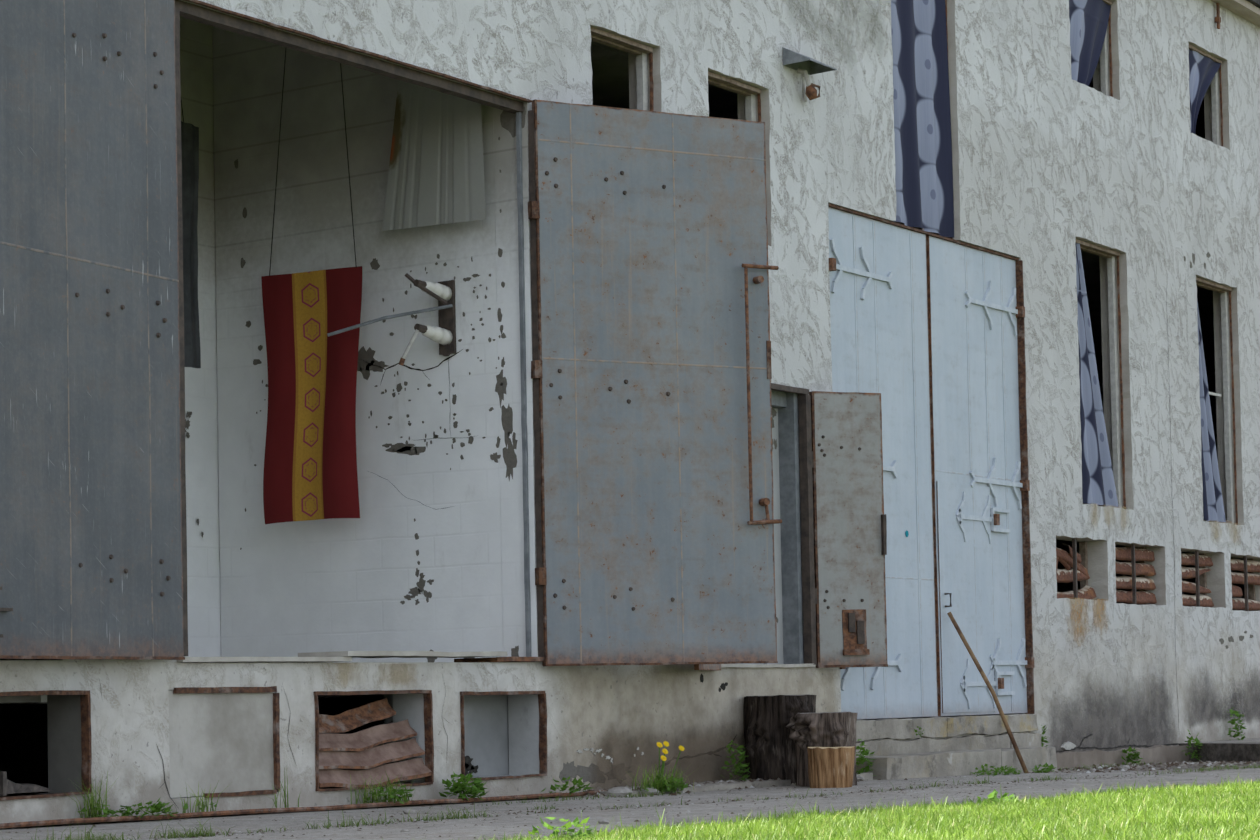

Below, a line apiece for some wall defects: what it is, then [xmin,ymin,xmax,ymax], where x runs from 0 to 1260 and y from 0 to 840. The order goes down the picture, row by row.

peeling [405,254,506,361]
peeling [357,346,518,481]
peeling [400,518,434,605]
water stain [1051,683,1171,753]
water stain [1189,683,1260,724]